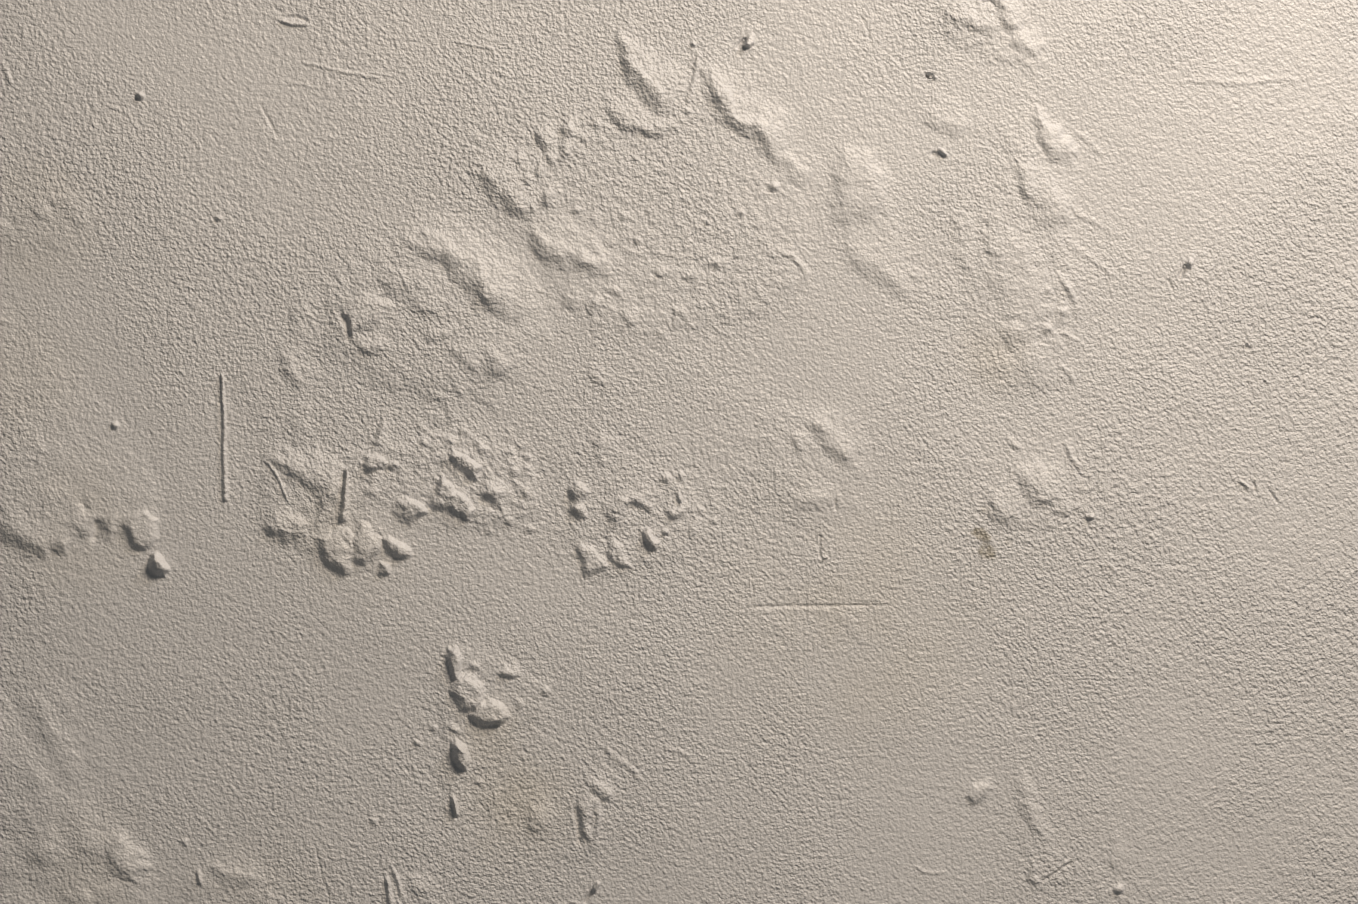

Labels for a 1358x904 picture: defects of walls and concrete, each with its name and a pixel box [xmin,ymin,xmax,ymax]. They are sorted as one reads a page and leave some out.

peeling [253,409,545,581]
peeling [410,639,557,820]